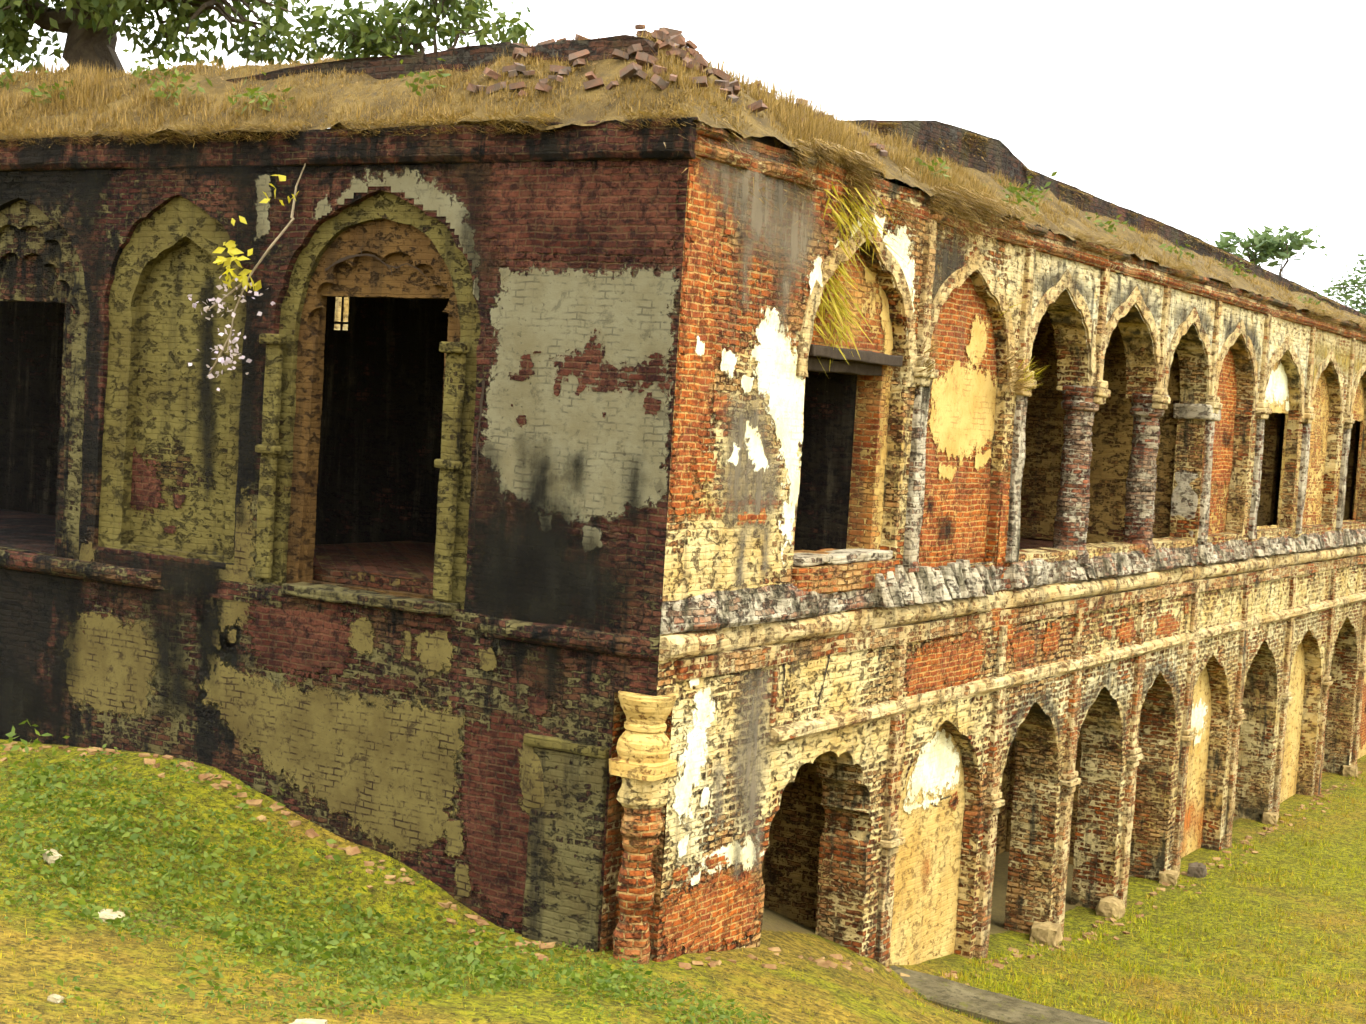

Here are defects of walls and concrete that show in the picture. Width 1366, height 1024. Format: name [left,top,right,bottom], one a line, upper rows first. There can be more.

flaking render [254,174,272,242]
water stain [239,339,262,482]
flaking render [312,158,805,564]
flaking render [904,314,1061,713]
water stain [0,578,78,741]
water stain [108,554,219,710]
flaking render [199,482,559,924]
flaking render [1103,615,1136,646]
flaking render [1155,603,1189,639]
flaking render [655,852,762,954]